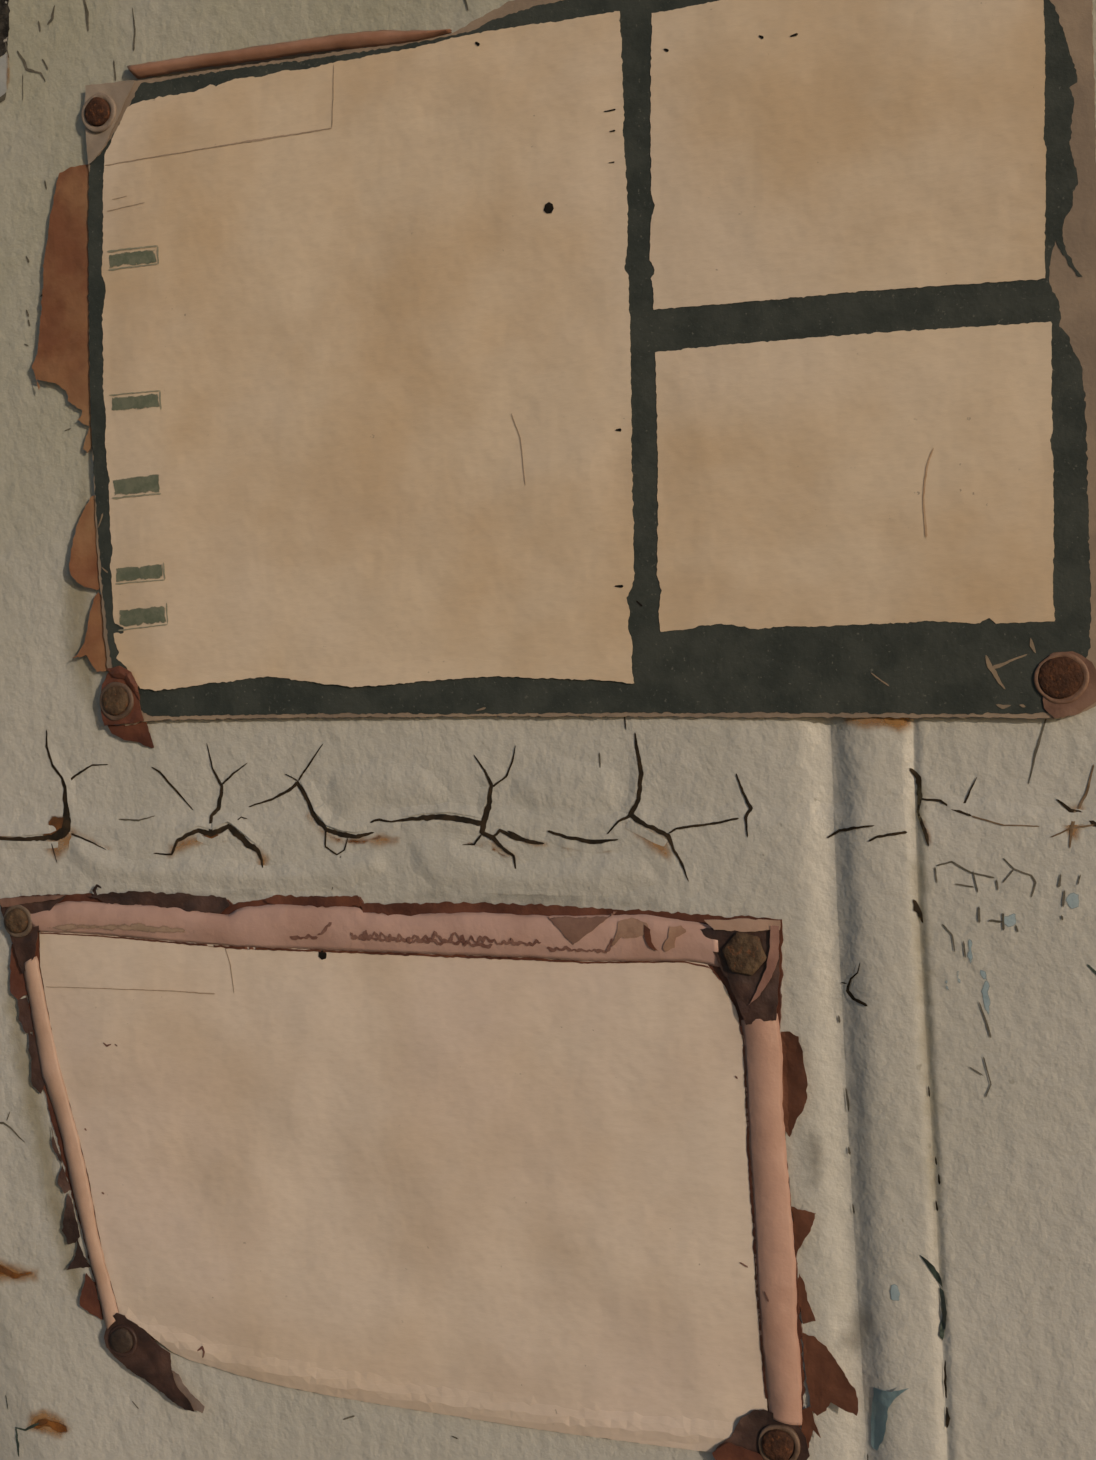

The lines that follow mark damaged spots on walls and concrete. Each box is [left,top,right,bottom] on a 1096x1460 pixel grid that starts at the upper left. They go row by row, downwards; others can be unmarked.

crack [0,717,753,889]
crack [827,718,1096,958]
peeling [977,907,1018,932]
peeling [1058,874,1081,920]
peeling [946,939,991,1038]
crack [970,1057,992,1098]
peeling [867,1387,909,1460]